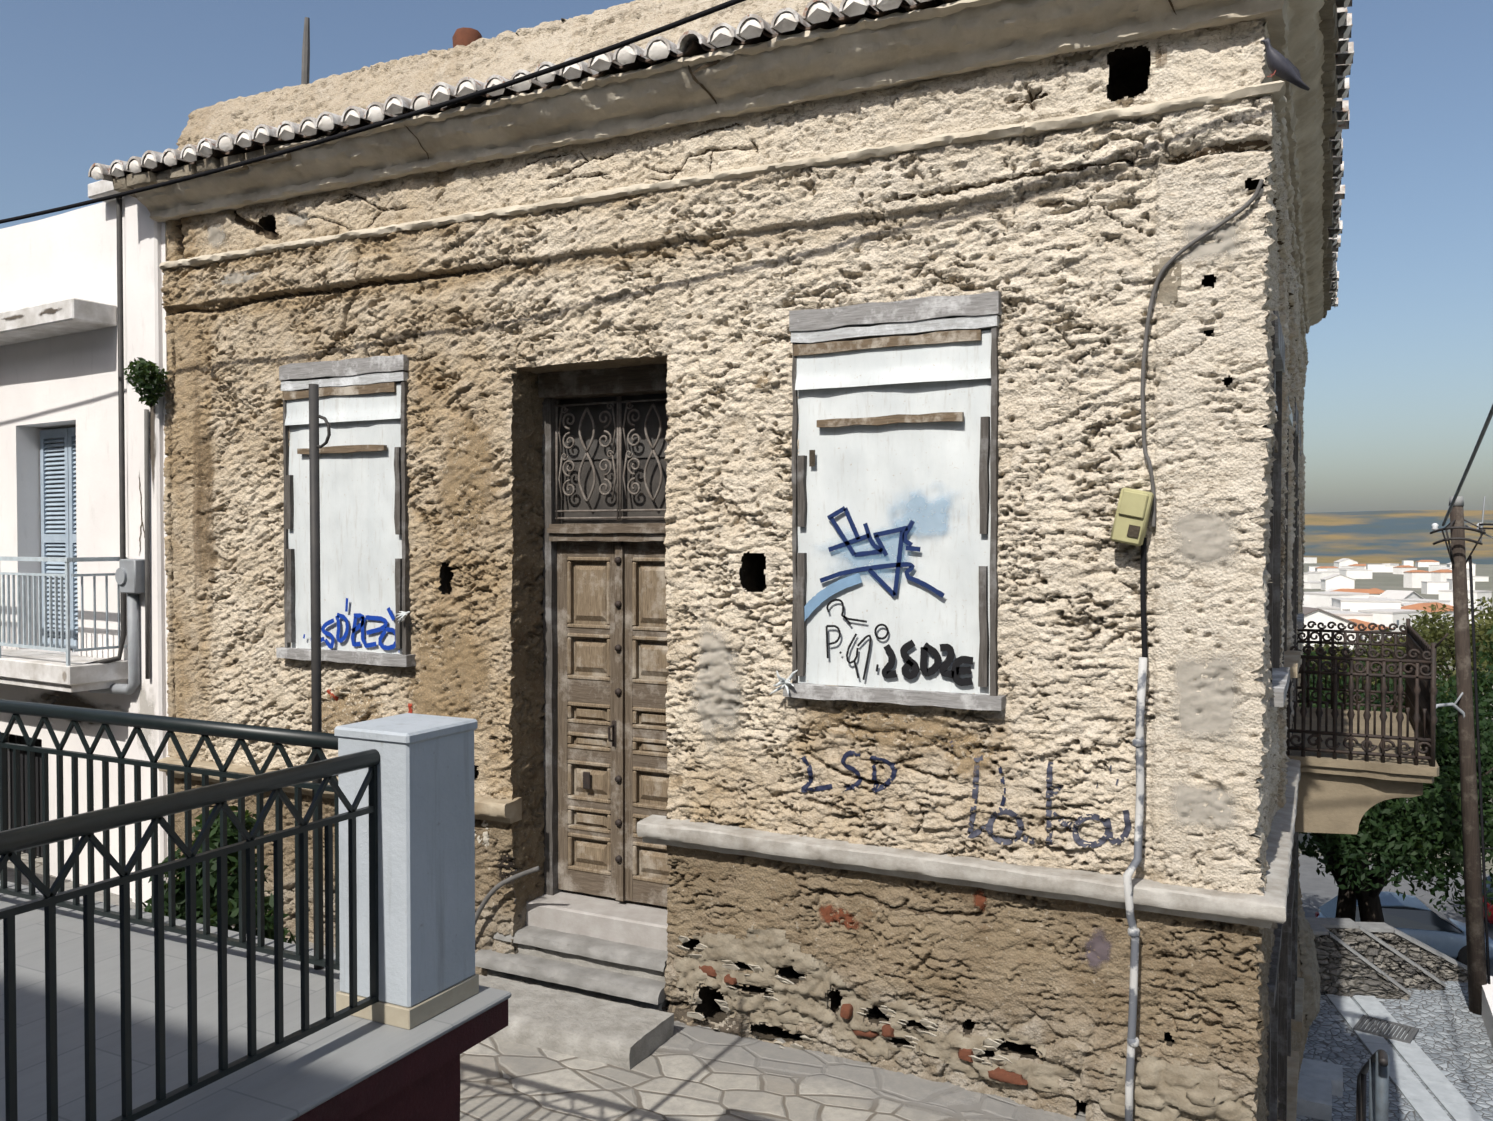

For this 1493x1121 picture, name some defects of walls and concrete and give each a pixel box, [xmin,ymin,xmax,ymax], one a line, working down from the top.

crack [525,56,759,188]
crack [170,192,511,361]
spalling [674,925,1074,1094]